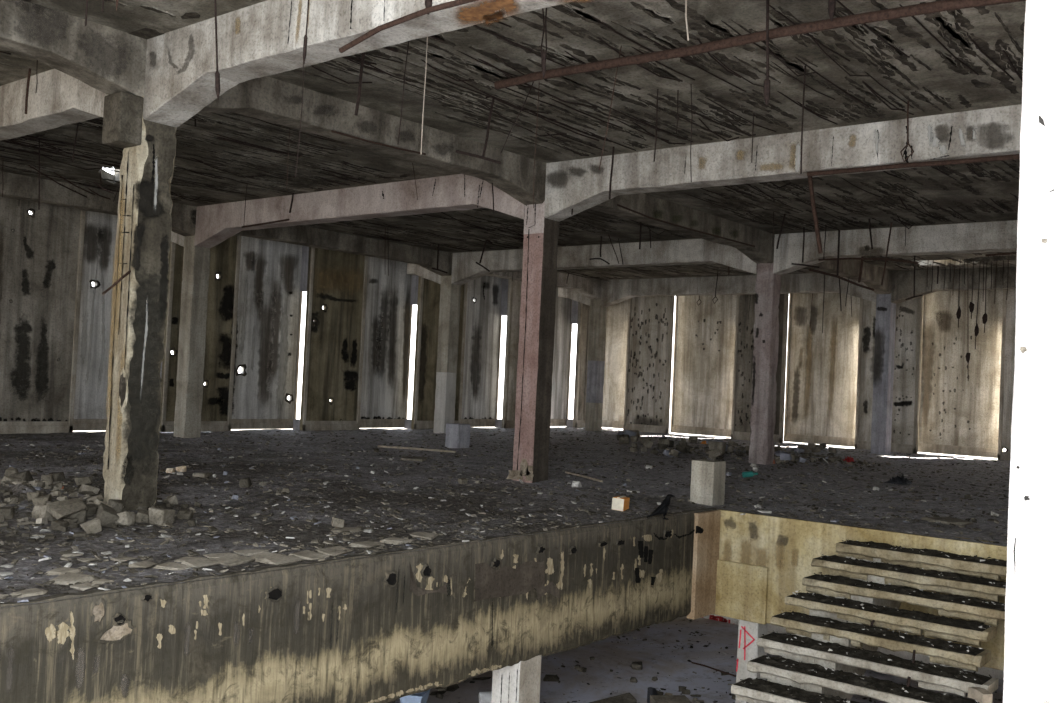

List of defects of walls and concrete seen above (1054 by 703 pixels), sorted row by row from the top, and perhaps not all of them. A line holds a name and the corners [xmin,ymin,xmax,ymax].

rust [457,0,518,25]
peeling [591,16,764,92]
peeling [753,5,914,115]
leakage [21,237,34,295]
leakage [43,260,56,288]
leakage [11,318,49,400]
leakage [372,292,427,403]
spalling [119,367,128,414]
peeling [534,545,577,595]
spalling [584,529,674,589]
peeling [45,612,75,660]
spalling [89,597,137,644]